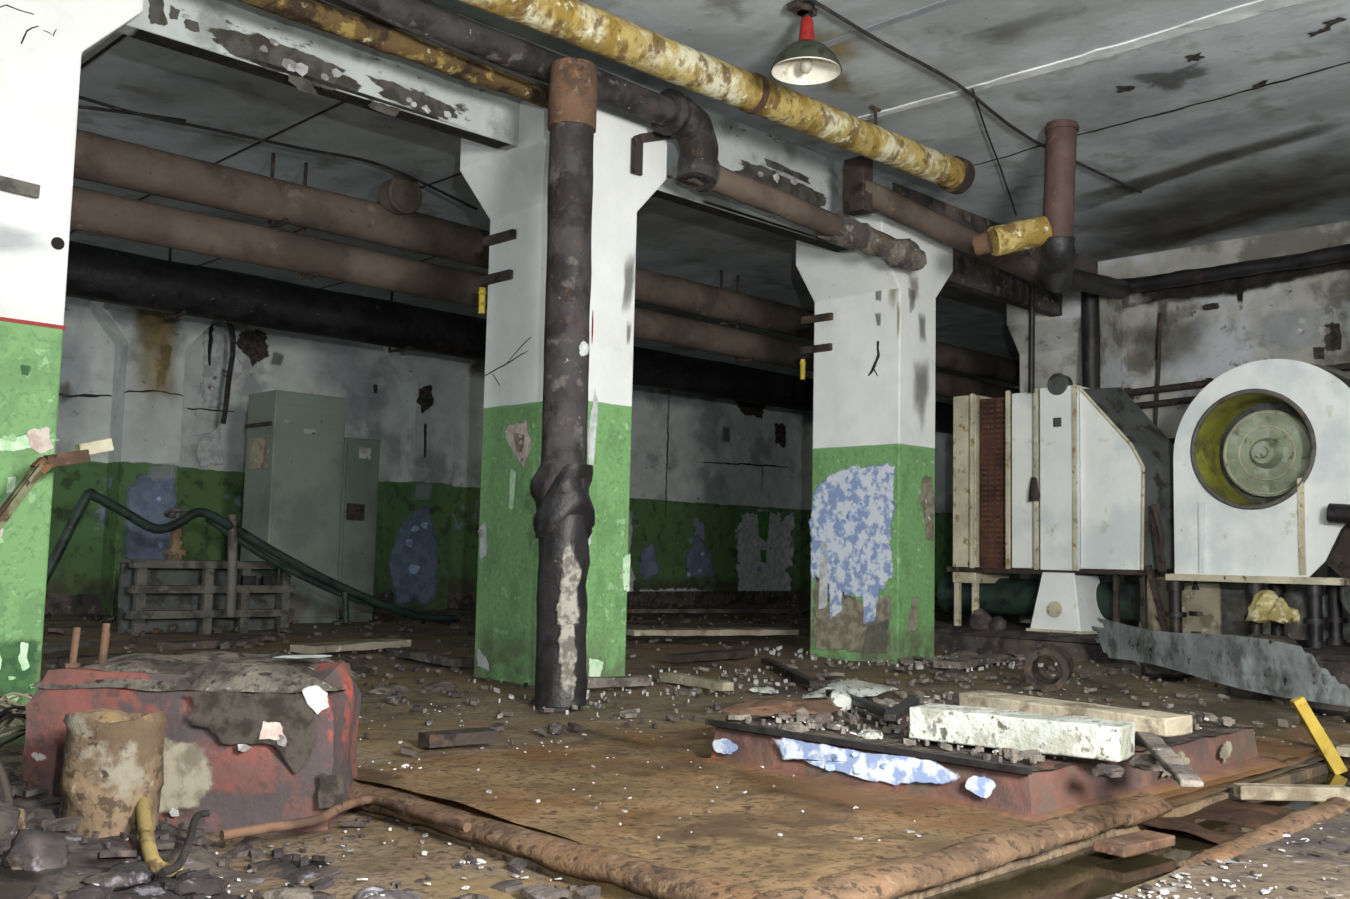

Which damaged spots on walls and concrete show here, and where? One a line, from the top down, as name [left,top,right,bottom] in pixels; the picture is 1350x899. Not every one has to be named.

peeling [148,0,458,120]
peeling [734,158,827,207]
leakage [1103,133,1310,195]
leakage [1172,205,1287,239]
rust [139,308,173,385]
peeling [200,323,283,409]
peeling [0,426,56,454]
peeling [125,474,176,560]
peeling [621,502,715,592]
peeling [735,462,896,653]
peeling [0,641,38,706]
peeling [589,658,604,677]